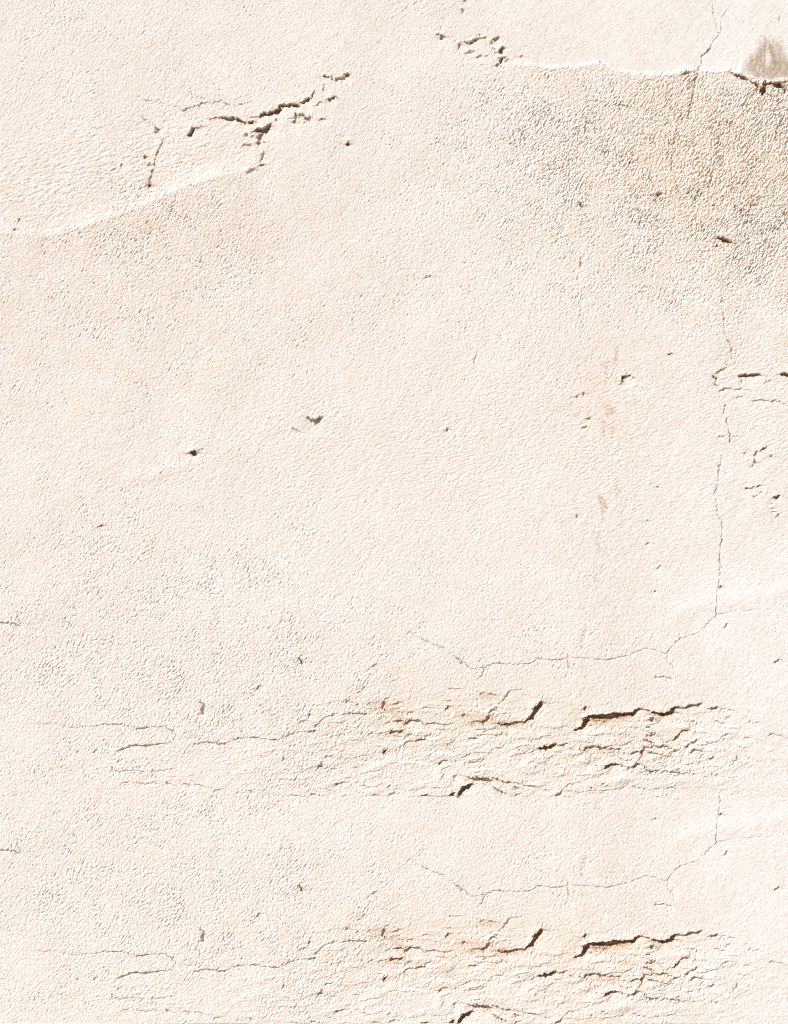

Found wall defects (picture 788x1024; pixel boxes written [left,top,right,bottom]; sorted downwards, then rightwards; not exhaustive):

flaking render [436,0,788,98]
crack [138,72,352,176]
crack [394,284,788,680]
crack [32,711,369,754]
crack [32,938,370,980]